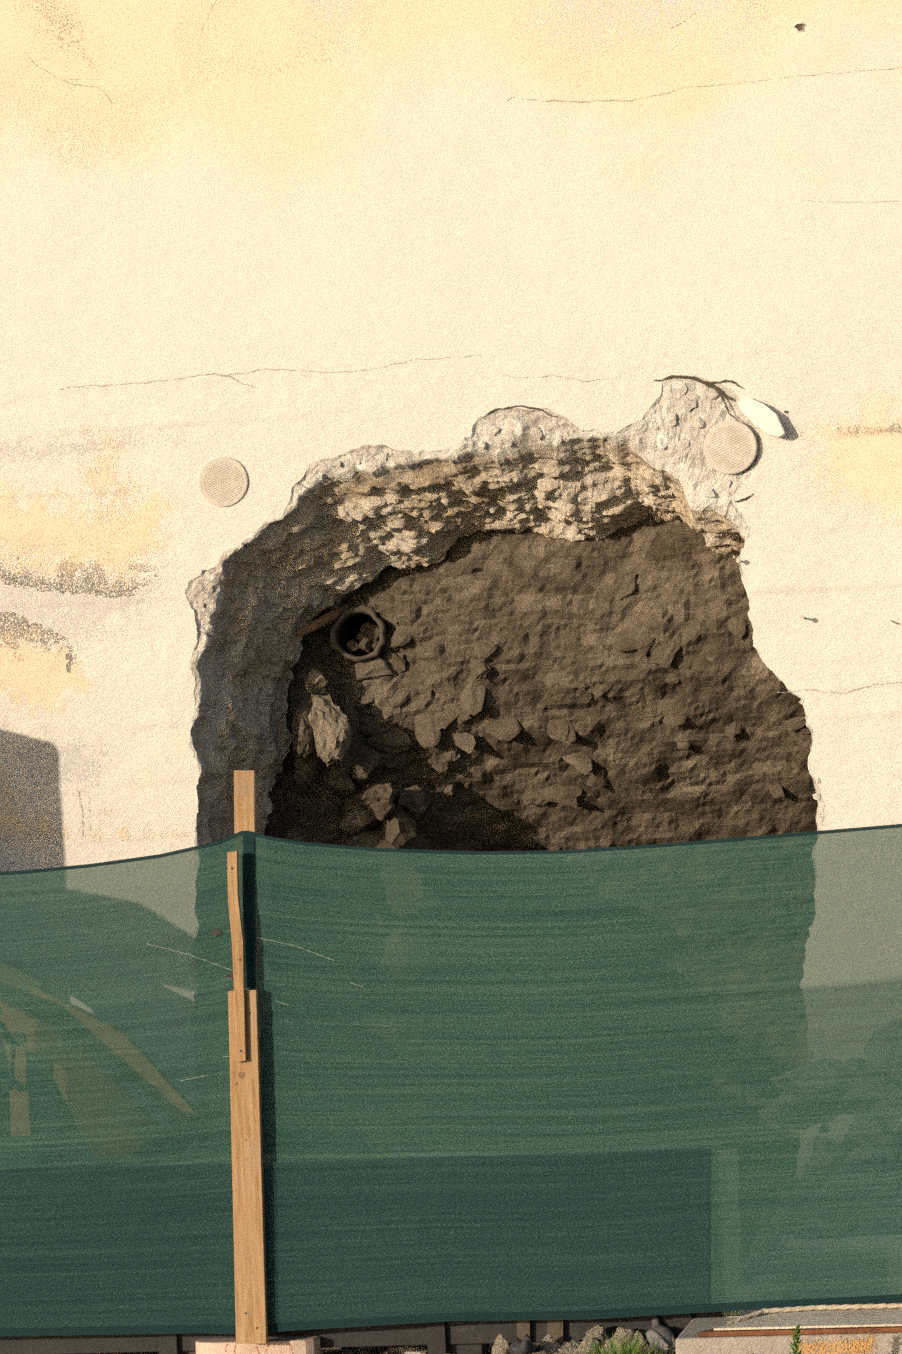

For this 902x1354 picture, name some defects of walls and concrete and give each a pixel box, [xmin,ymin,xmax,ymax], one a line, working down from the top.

spalling [0,375,902,851]